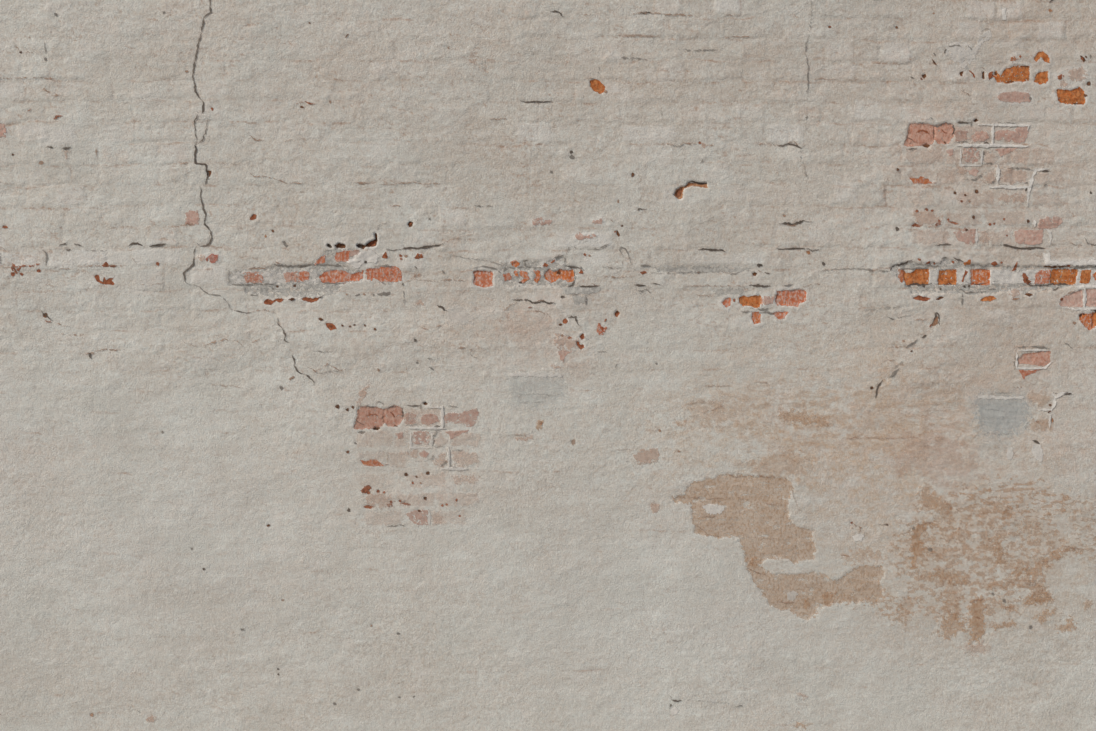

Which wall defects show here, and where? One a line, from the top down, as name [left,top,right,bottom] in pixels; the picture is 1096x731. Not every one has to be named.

peeling [932,28,1091,105]
crack [41,0,342,391]
peeling [897,168,933,184]
peeling [904,117,1049,206]
peeling [228,233,423,305]
peeling [473,255,597,288]
peeling [722,290,806,324]
peeling [882,208,1096,330]
peeling [1014,346,1051,388]
peeling [346,401,479,484]
peeling [361,485,431,527]